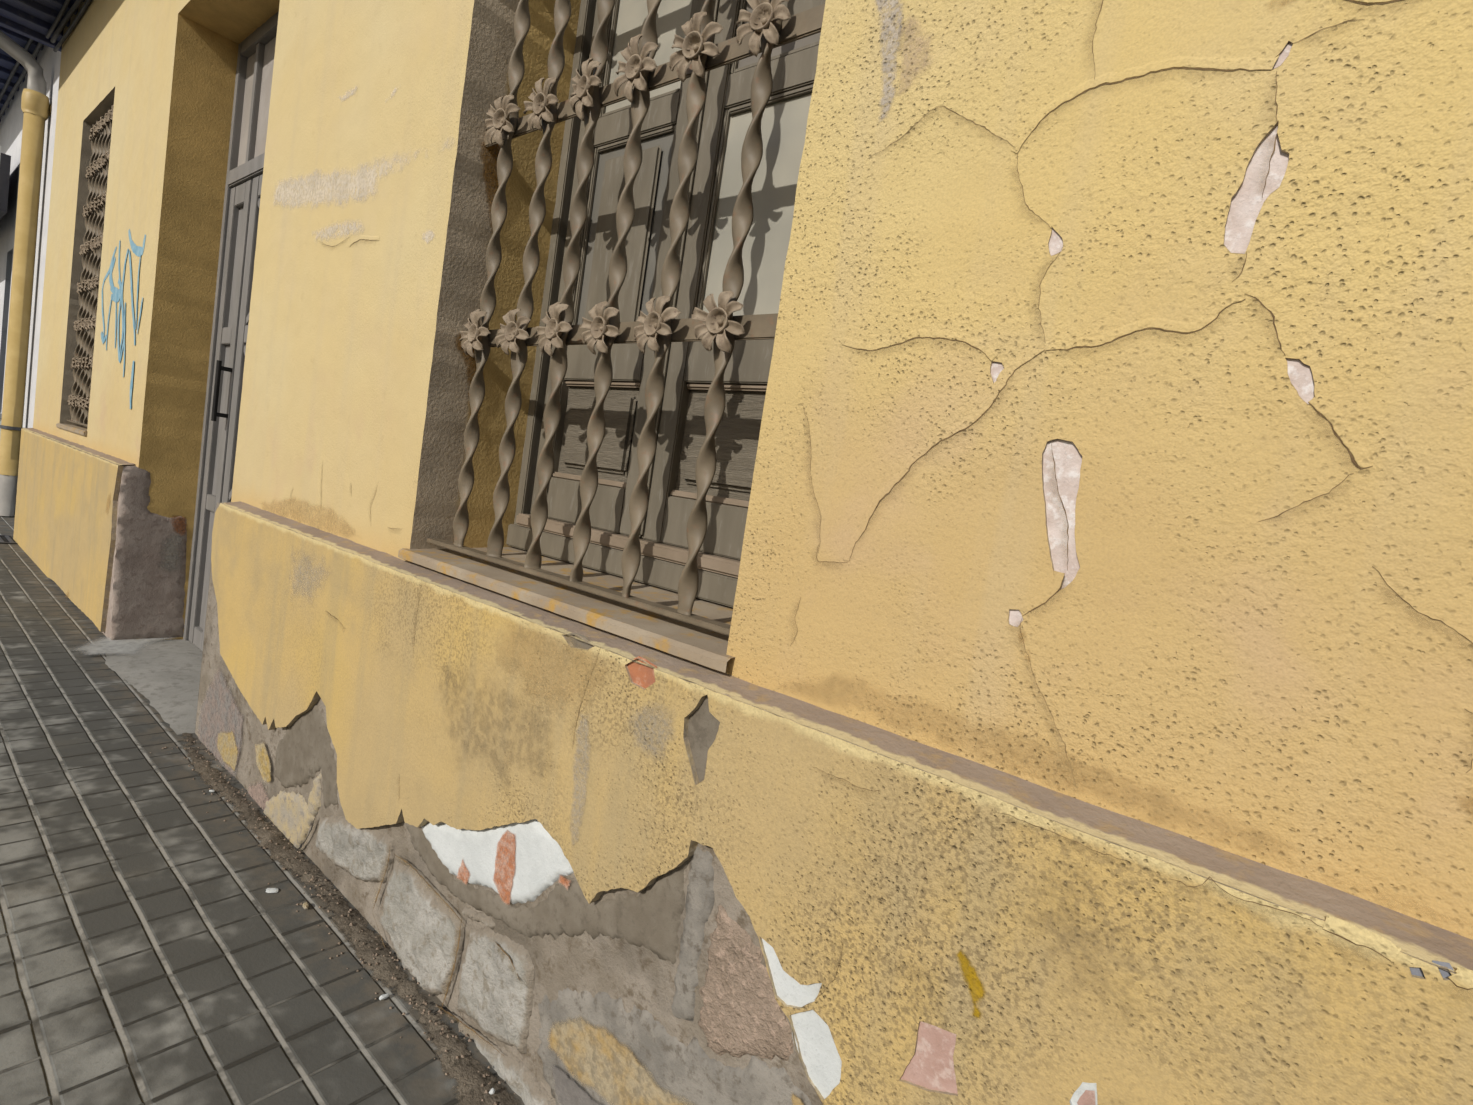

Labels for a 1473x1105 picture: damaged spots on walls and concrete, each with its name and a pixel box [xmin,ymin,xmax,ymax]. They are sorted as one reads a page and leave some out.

peeling [1224,120,1289,254]
crack [804,0,1400,563]
peeling [111,466,187,640]
peeling [625,656,657,690]
crack [1018,571,1077,788]
peeling [1042,439,1082,592]
crack [1372,566,1473,644]
spalling [198,672,842,1105]
peeling [899,1021,958,1096]
peeling [1069,1082,1098,1105]